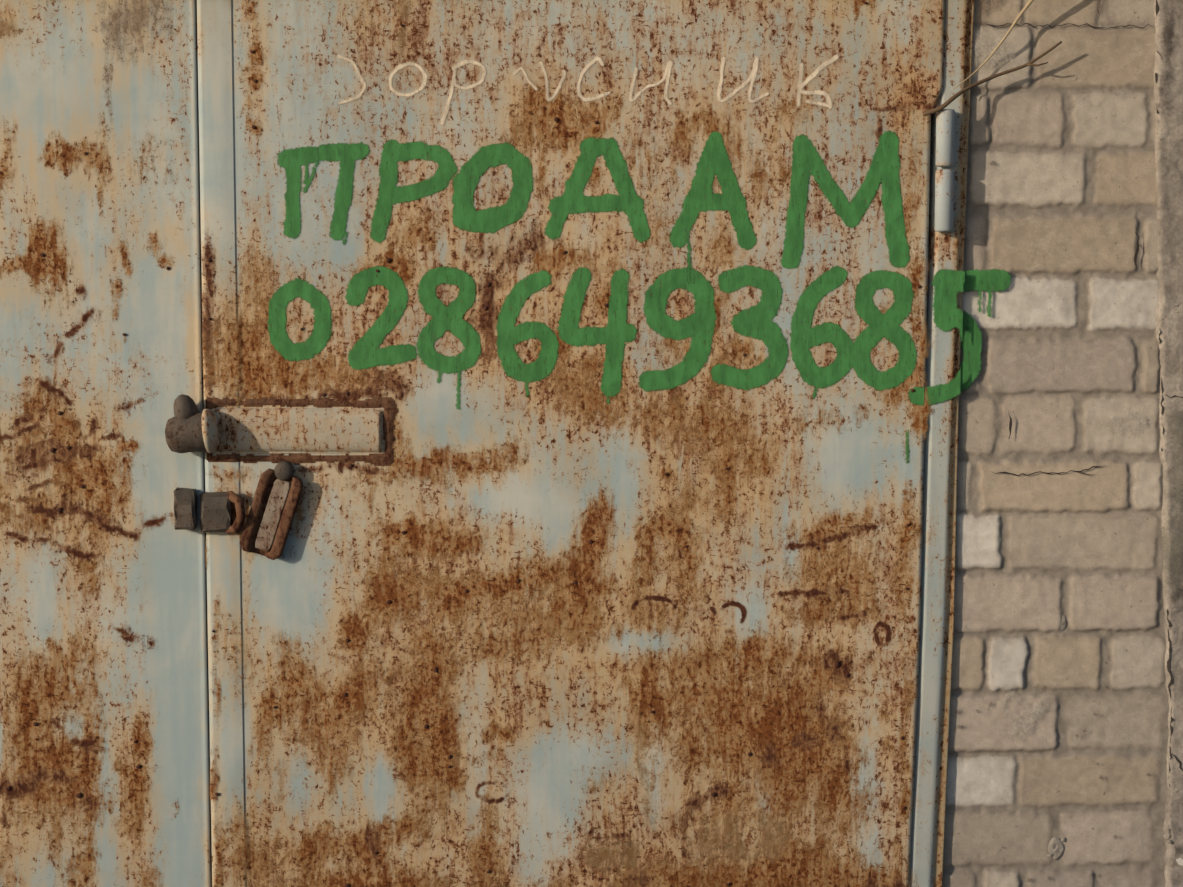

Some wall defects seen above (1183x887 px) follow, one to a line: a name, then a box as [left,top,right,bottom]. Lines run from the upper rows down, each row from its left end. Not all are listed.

rust [0,216,75,307]
rust [40,0,177,212]
rust [108,241,131,320]
rust [239,0,265,136]
rust [502,84,626,196]
rust [626,104,791,268]
rust [793,135,933,455]
rust [0,378,144,604]
rust [201,209,920,887]
crack [994,466,1101,476]
rust [0,633,160,887]
crack [1167,609,1183,799]